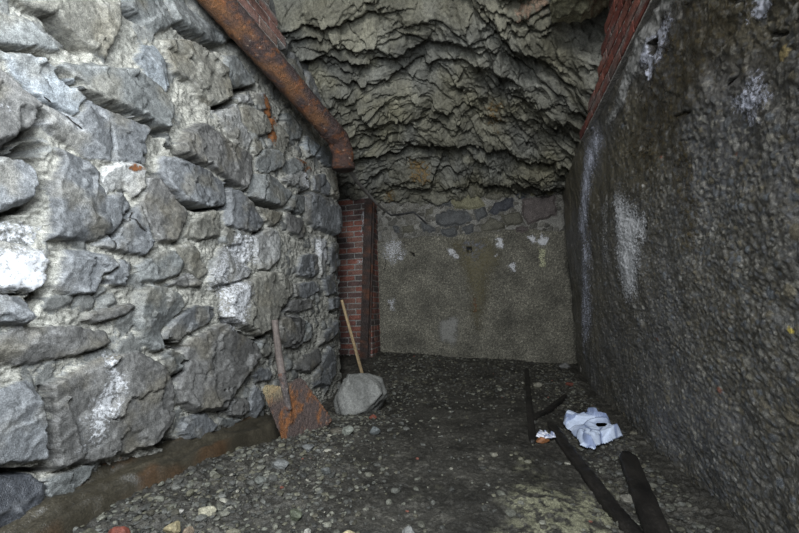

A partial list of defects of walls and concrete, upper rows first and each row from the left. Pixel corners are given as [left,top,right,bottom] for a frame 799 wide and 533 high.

rust [263,93,277,143]
water stain [601,0,773,305]
water stain [446,237,516,331]
water stain [527,234,549,268]
water stain [578,120,604,353]